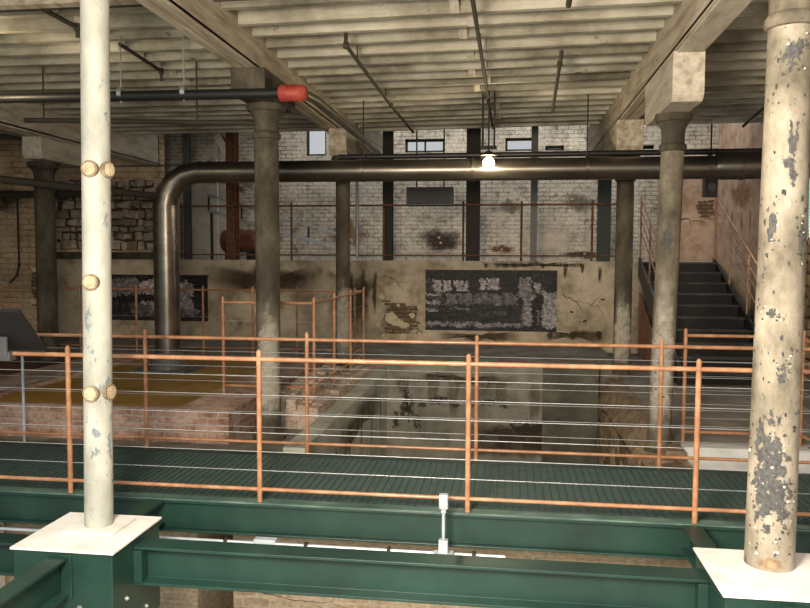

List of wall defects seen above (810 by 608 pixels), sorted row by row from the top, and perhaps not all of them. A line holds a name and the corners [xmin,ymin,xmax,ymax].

peeling [764,30,810,104]
peeling [763,113,804,259]
flaking render [375,294,423,340]
spalling [773,195,810,384]
peeling [749,411,799,557]